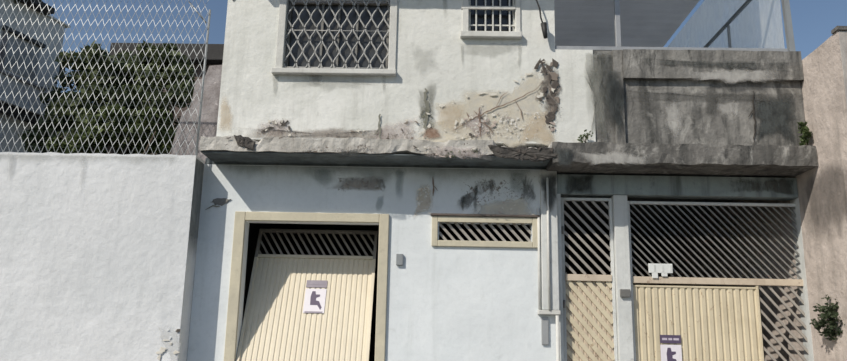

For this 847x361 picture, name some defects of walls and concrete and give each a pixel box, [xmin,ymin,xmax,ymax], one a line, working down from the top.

damp [665,60,764,83]
spalling [226,135,256,150]
peeling [261,118,291,136]
peeling [378,58,562,162]
damp [588,54,624,133]
damp [586,153,642,164]
damp [699,93,793,140]
crack [748,91,756,145]
peeling [205,198,231,210]
damp [431,179,540,218]
damp [541,175,556,208]
peeling [156,329,180,361]